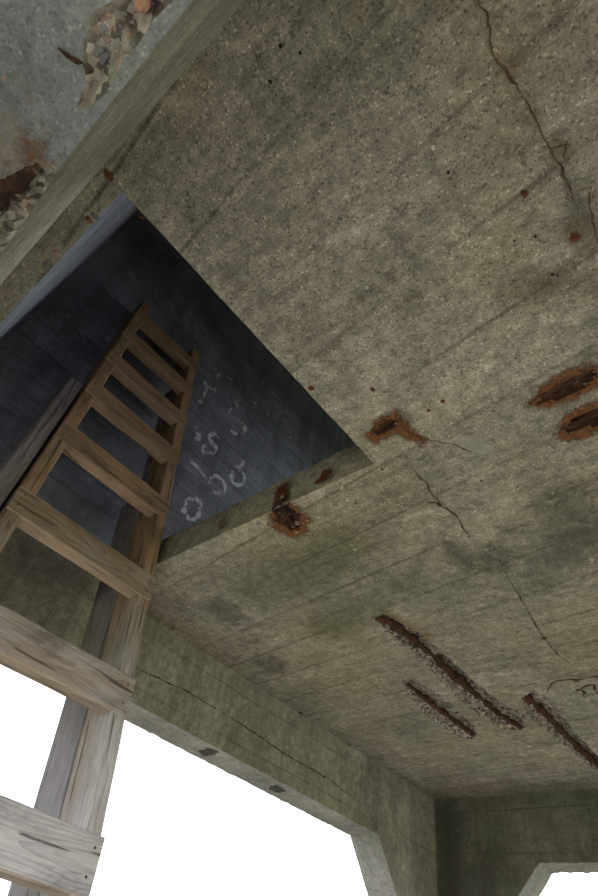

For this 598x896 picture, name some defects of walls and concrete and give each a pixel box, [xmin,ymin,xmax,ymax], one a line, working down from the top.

spalling [0,132,63,253]
spalling [77,0,174,110]
crack [477,0,598,249]
crack [410,468,476,544]
spalling [367,613,598,772]
crack [497,558,598,697]